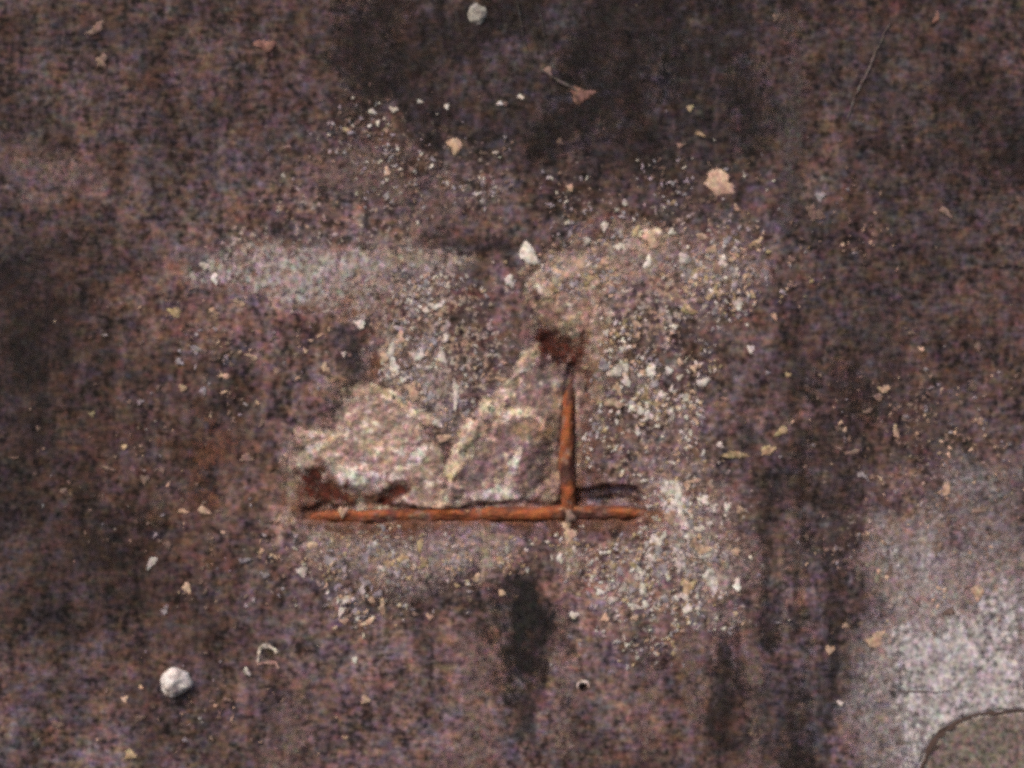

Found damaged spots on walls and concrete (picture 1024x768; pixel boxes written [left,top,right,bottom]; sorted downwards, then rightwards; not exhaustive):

peeling [279,97,518,226]
peeling [788,166,894,287]
peeling [89,420,174,472]
spalling [139,143,805,676]
corrosion [302,328,664,531]
leakage [660,468,722,554]
peeling [805,367,1024,648]
peeling [175,679,235,753]
leakage [503,569,577,739]
peeling [825,622,863,655]
leakage [862,521,1024,768]
crack [920,709,1024,768]